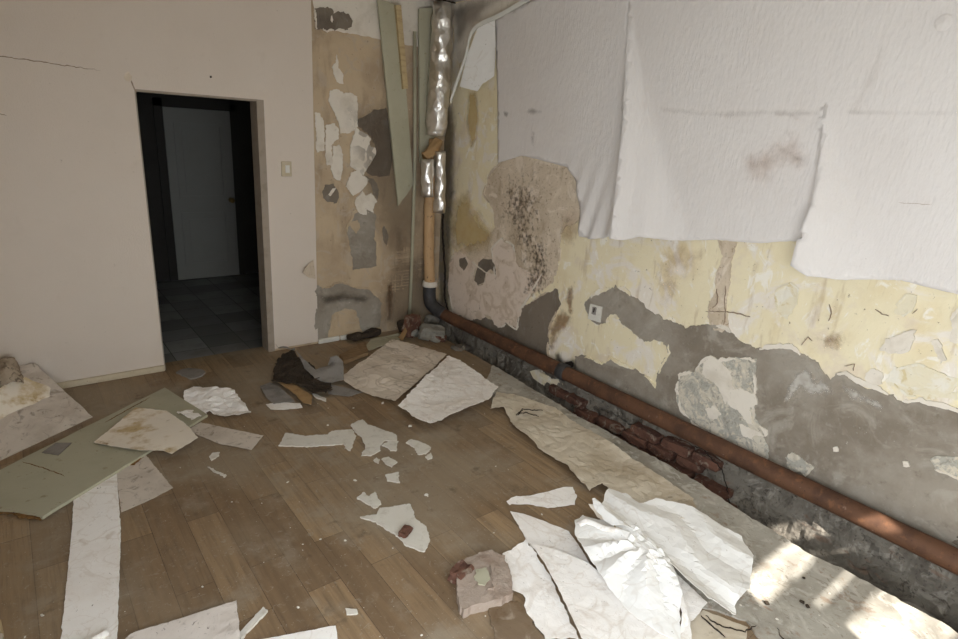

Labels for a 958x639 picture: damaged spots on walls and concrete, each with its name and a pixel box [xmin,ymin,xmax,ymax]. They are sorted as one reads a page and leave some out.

crack [0,56,101,71]
peeling [313,0,438,47]
peeling [452,0,521,63]
peeling [315,55,393,270]
leakage [508,190,545,292]
spalling [314,282,382,339]
peeling [447,238,561,357]
spalling [530,370,738,509]
spalling [574,240,958,548]